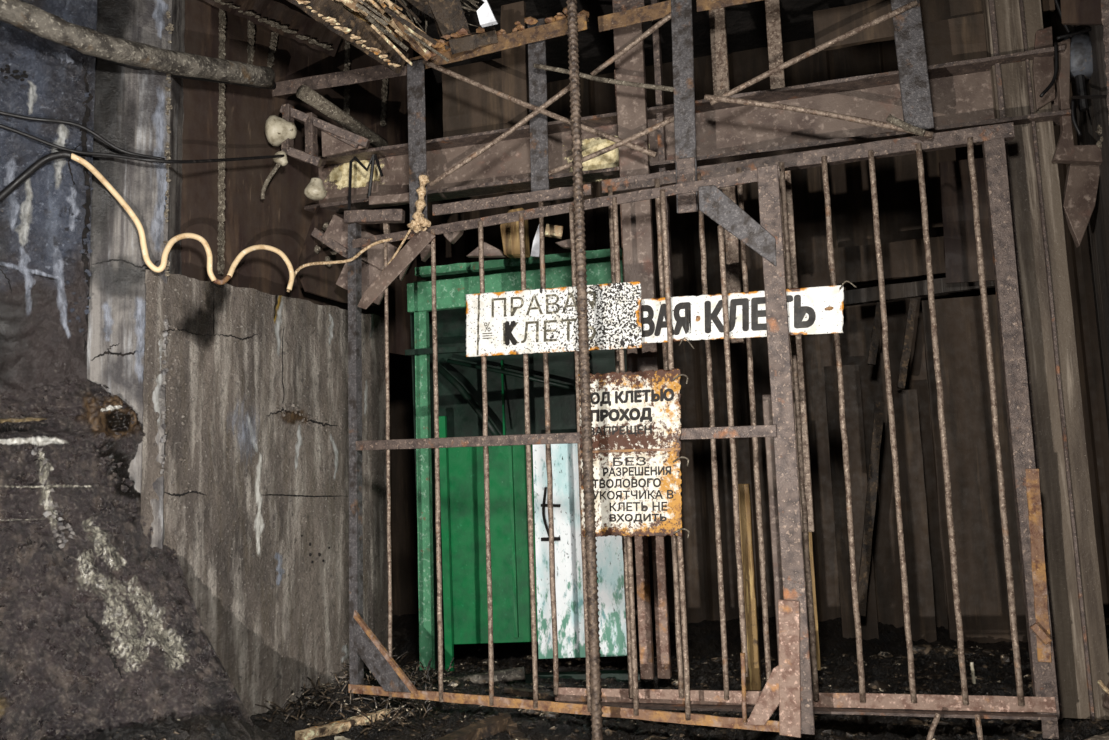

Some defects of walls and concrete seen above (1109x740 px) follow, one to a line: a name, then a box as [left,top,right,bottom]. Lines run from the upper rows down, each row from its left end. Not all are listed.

crack [0,59,183,361]
crack [214,333,258,341]
damp [274,295,283,354]
crack [269,409,338,426]
damp [330,436,338,478]
crack [164,490,205,498]
damp [242,417,264,554]